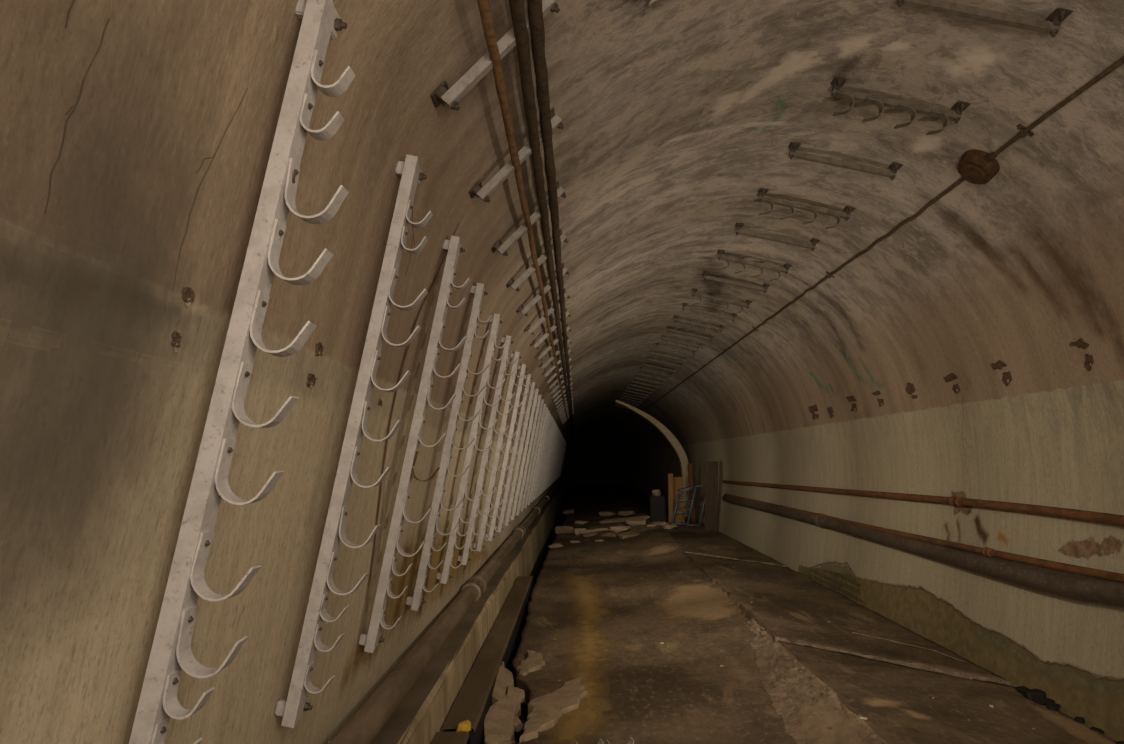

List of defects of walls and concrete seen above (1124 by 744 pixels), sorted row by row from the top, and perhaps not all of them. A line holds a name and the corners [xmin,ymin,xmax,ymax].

crack [65,0,75,28]
crack [44,18,110,214]
crack [172,88,248,292]
spalling [1059,536,1121,558]
flaking render [799,561,1124,741]